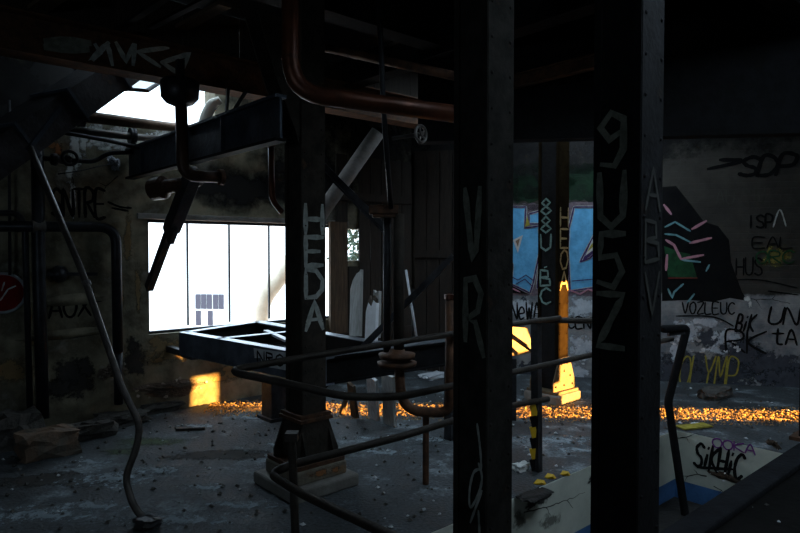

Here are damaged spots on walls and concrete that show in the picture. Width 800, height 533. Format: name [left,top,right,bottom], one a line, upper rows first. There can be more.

leakage [49,356,95,400]
peeling [660,318,800,388]